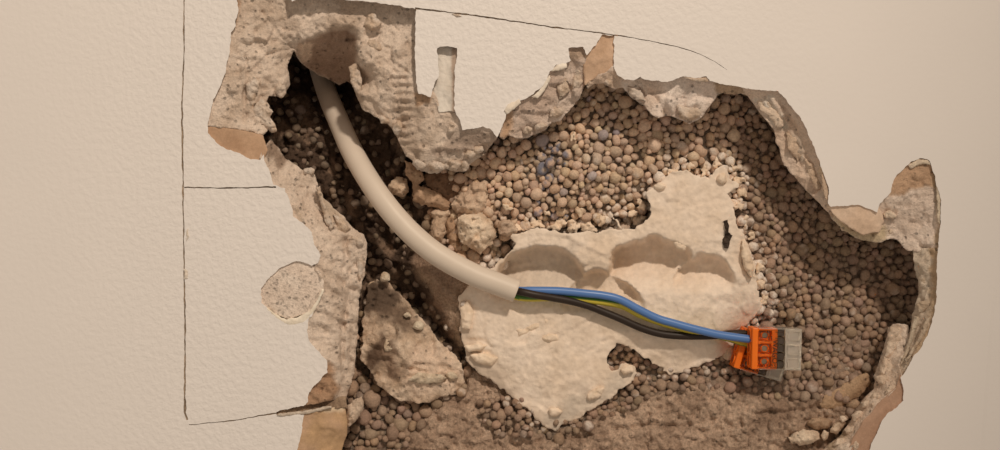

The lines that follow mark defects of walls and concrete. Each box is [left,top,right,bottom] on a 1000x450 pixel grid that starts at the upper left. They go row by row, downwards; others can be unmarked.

crack [181,0,348,425]
crack [415,7,727,70]
spalling [208,0,941,450]